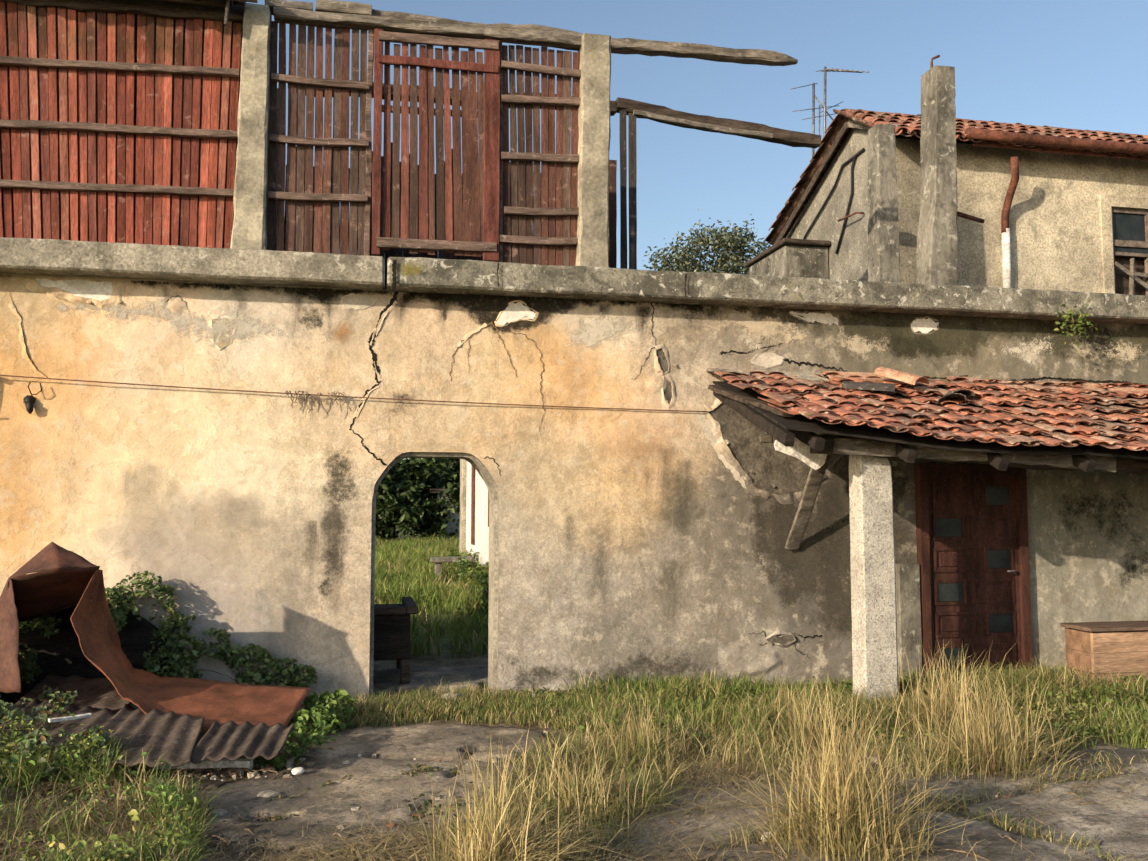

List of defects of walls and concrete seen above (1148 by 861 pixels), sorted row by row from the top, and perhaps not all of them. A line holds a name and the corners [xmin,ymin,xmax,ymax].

crack [349,260,398,466]
crack [449,322,545,430]
peeling [494,300,539,327]
crack [631,302,656,380]
peeling [910,316,939,335]
leakage [309,452,355,595]
leakage [1060,494,1148,585]
flaking render [765,628,796,648]